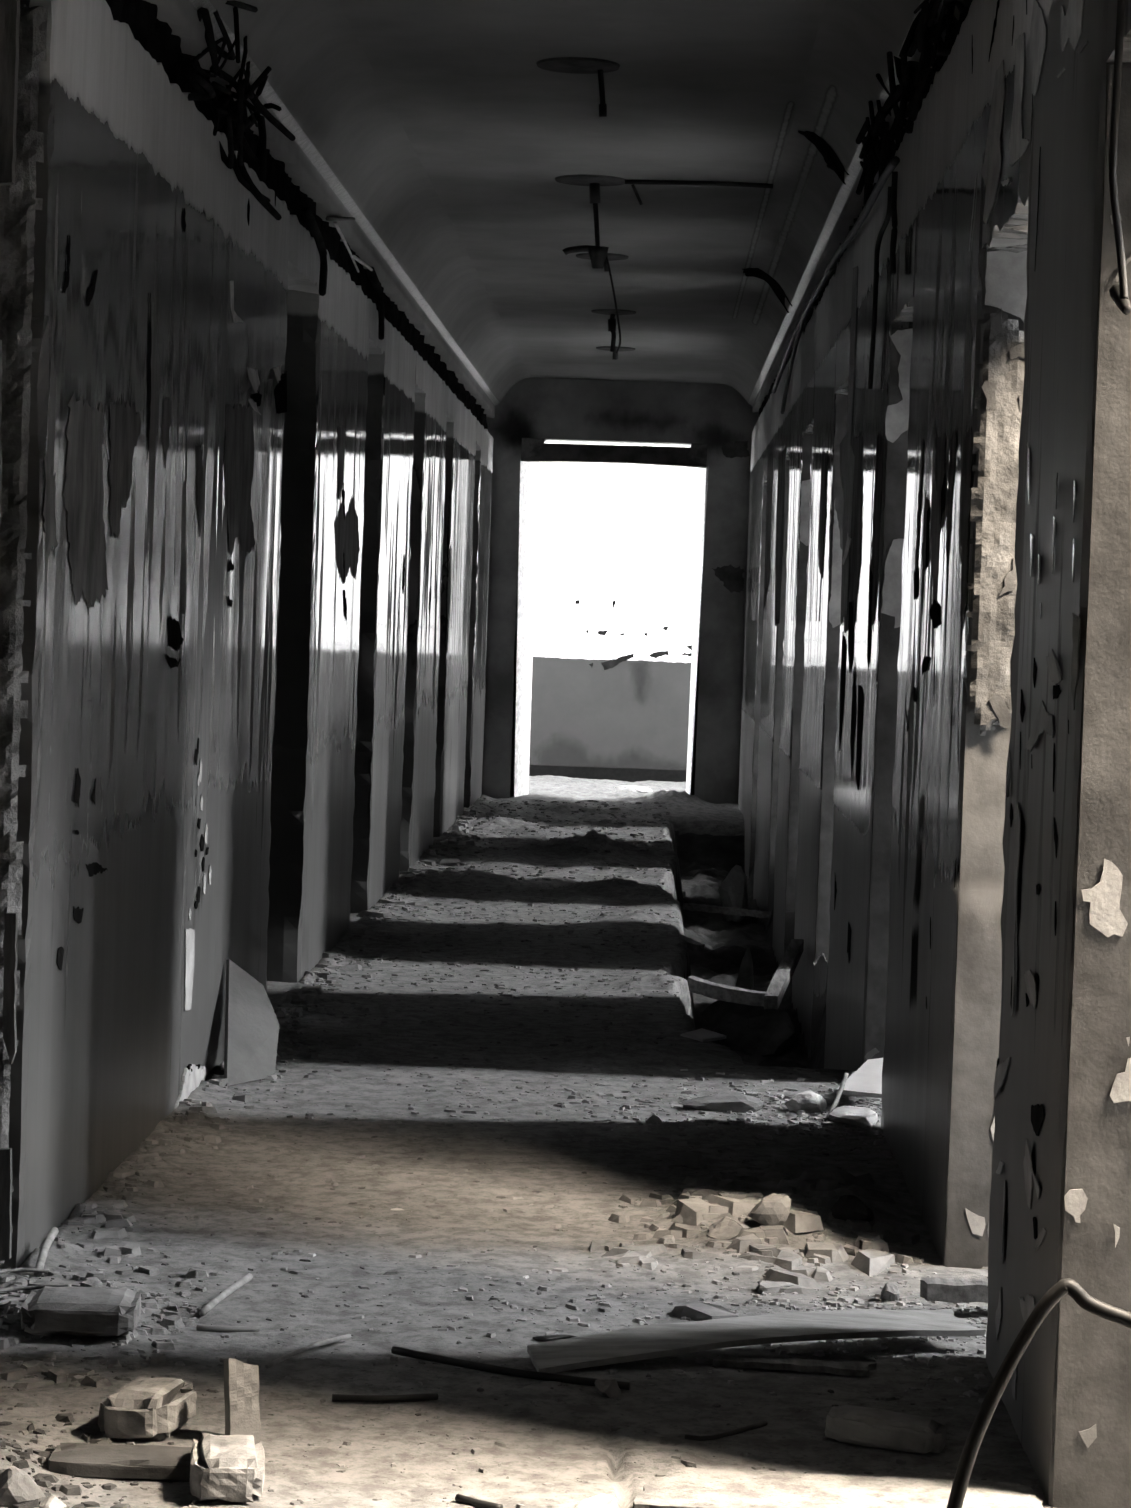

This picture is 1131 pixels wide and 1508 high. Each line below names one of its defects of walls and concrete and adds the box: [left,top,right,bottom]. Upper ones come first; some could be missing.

spalling [798,130,849,185]
peeling [224,364,287,572]
peeling [335,425,360,584]
flaking render [0,5,141,1148]
peeling [166,616,184,669]
flaking render [764,250,1081,1017]
flaking render [1081,859,1128,937]
peeling [990,1057,1011,1141]
flaking render [1110,1037,1131,1103]
flaking render [965,1208,989,1237]
peeling [1023,1104,1047,1252]
flaking render [1064,1189,1088,1223]